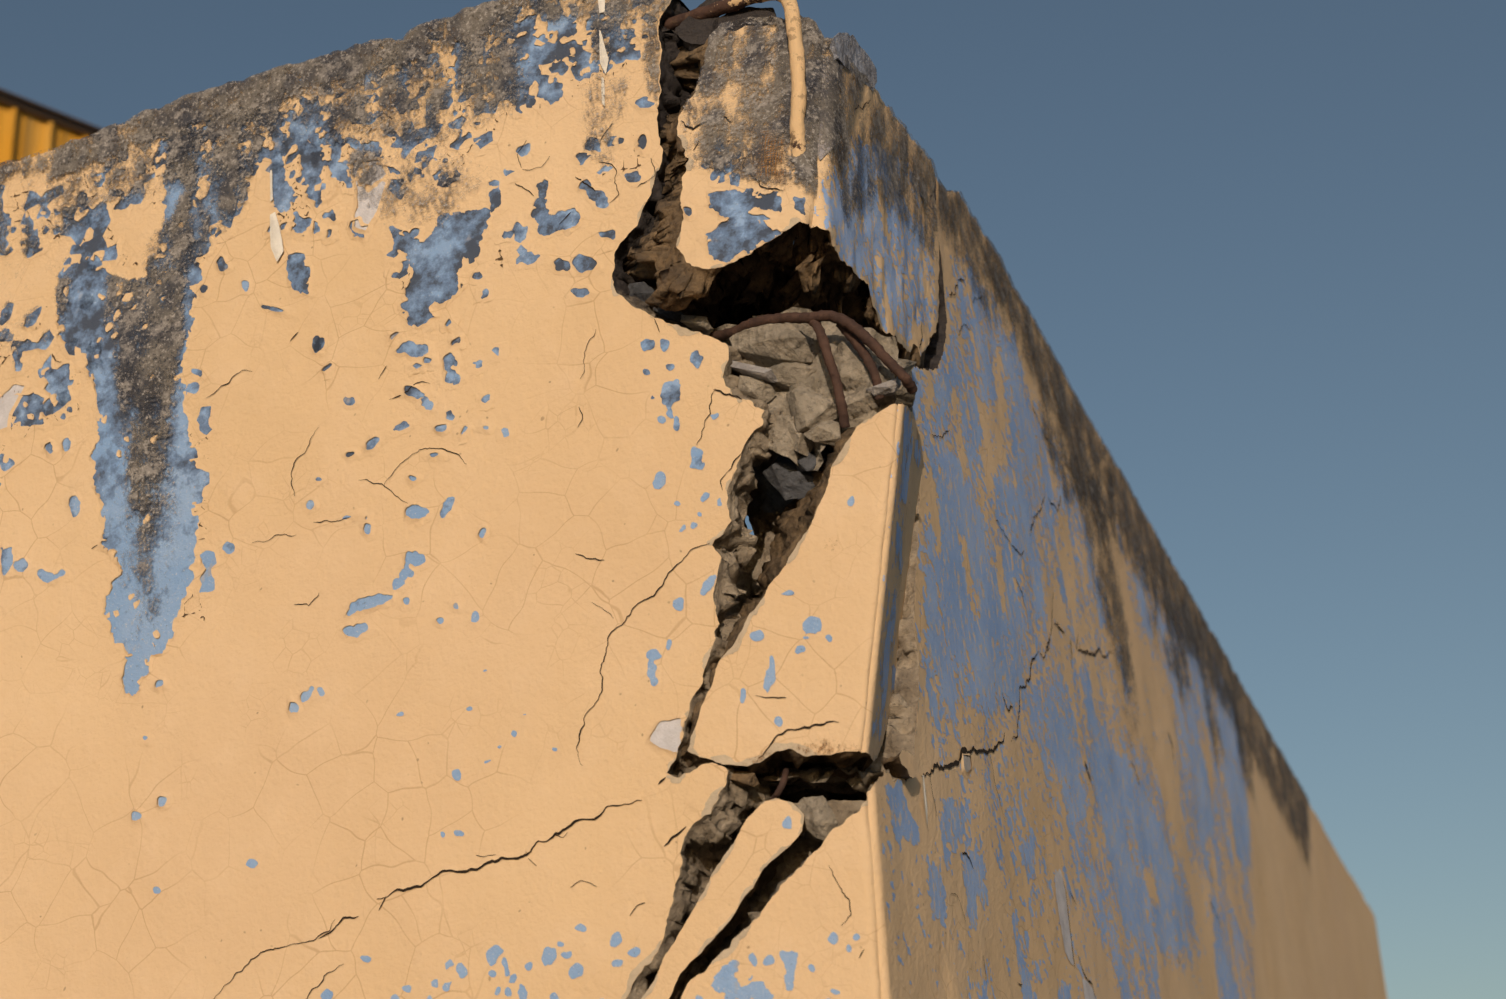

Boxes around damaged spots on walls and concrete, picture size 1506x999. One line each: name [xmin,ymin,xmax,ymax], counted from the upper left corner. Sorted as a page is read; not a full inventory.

peeling [127,792,174,826]
leakage [0,0,670,623]
peeling [0,0,807,719]
peeling [390,959,468,999]
peeling [486,941,584,999]
crack [214,0,1113,999]
peeling [610,33,1256,999]
leakage [683,16,1312,870]